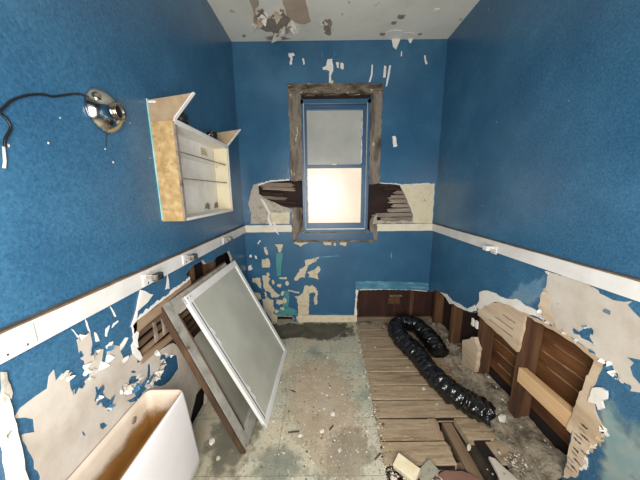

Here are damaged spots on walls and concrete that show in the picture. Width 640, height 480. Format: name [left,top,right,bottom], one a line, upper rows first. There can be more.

spalling [252,9,300,43]
peeling [323,59,344,84]
spalling [248,170,309,235]
spalling [368,182,435,225]
peeling [249,240,321,322]
peeling [0,249,229,480]
spalling [354,271,640,480]